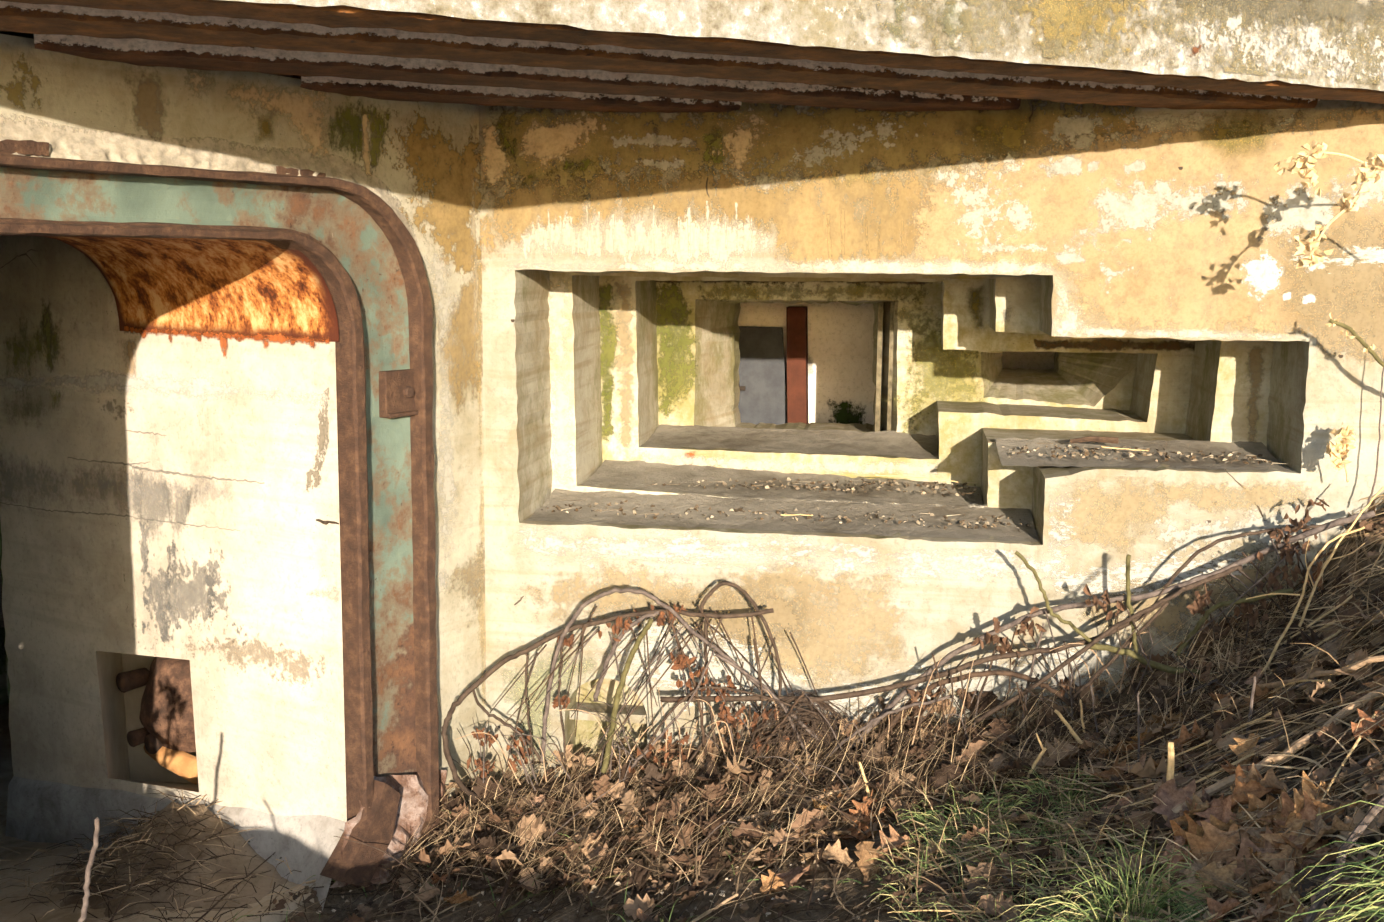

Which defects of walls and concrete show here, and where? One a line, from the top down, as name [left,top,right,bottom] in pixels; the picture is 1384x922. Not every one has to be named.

damp [0,0,1384,481]
peeling [936,113,1384,304]
rust [124,325,329,377]